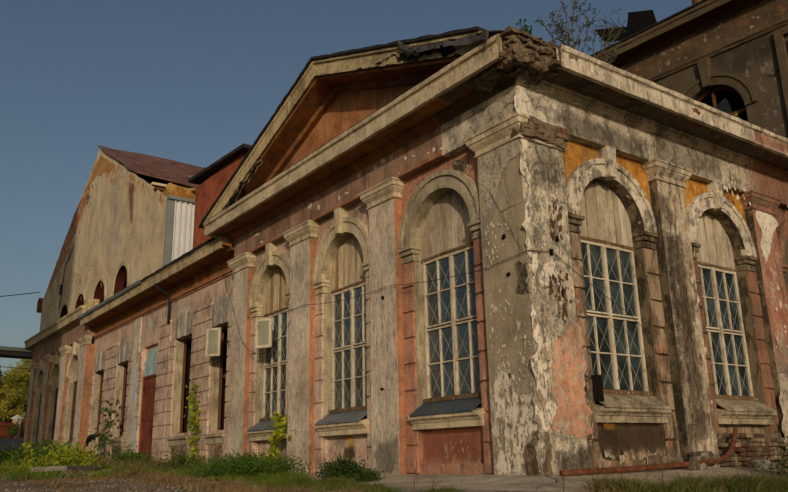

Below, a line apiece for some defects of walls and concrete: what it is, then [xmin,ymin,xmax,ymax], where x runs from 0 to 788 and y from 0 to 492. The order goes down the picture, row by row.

spalling [375,45,456,64]
spalling [463,26,558,140]
flaking render [451,138,594,475]
damp [654,237,705,443]
flaking render [604,447,627,465]
damp [594,422,674,453]